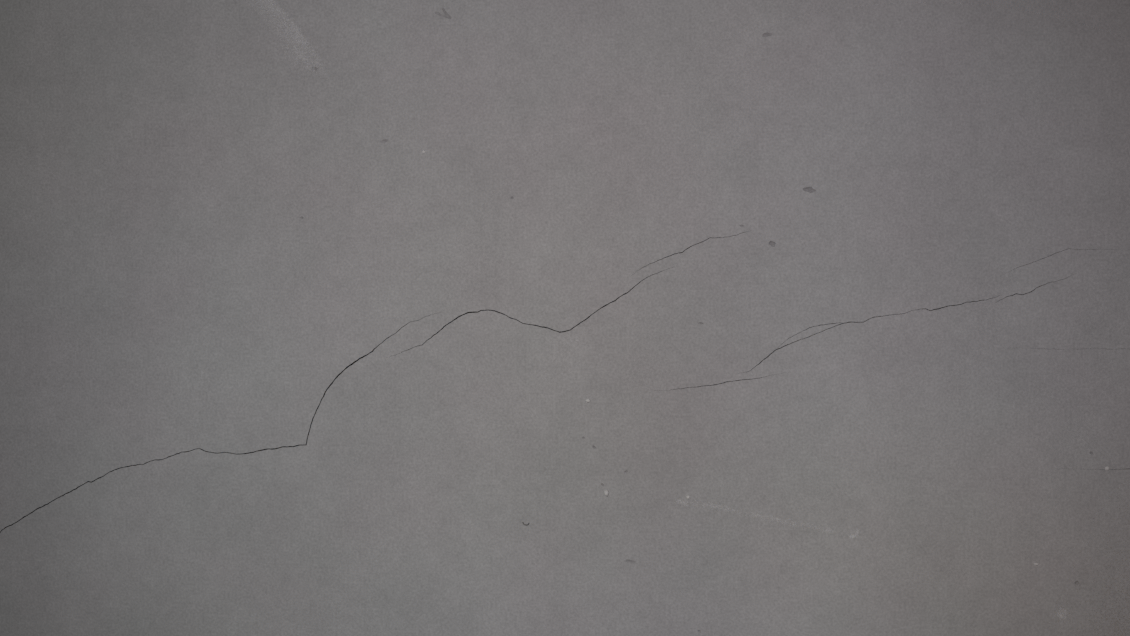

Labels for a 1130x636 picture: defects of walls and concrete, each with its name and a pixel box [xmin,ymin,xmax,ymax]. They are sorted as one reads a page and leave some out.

crack [0,232,744,533]
crack [672,249,1096,390]